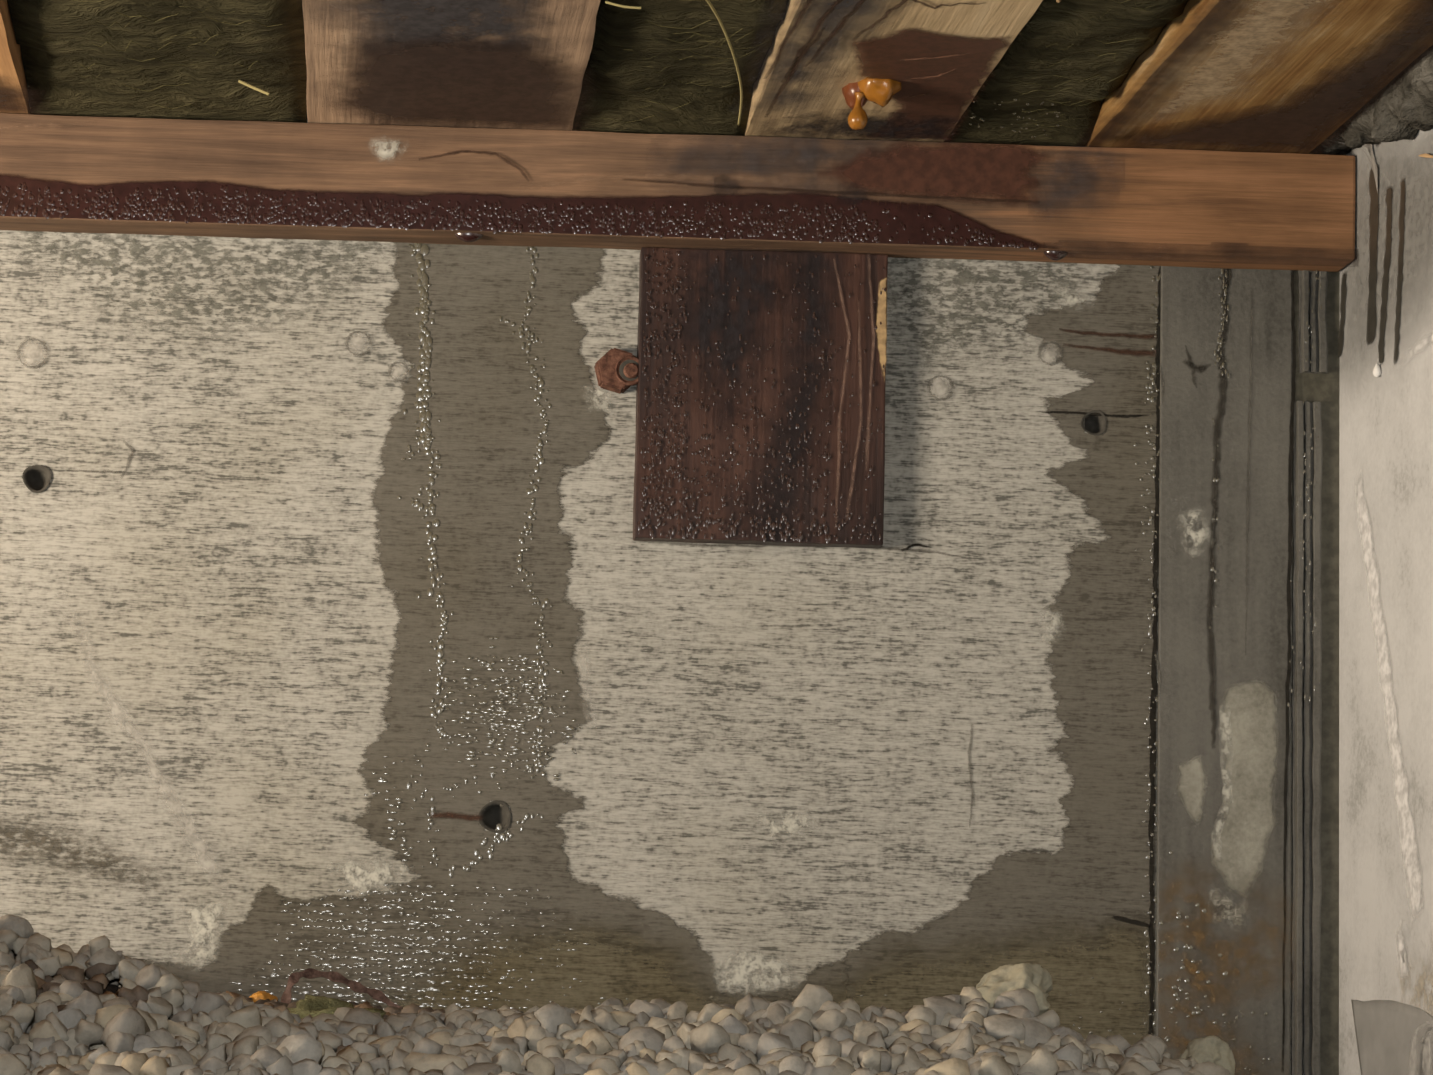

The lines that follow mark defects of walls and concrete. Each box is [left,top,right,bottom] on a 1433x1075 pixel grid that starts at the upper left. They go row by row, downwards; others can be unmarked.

damp [0,0,1161,1045]
corrosion [1158,898,1271,1071]
damp [1287,158,1433,1075]